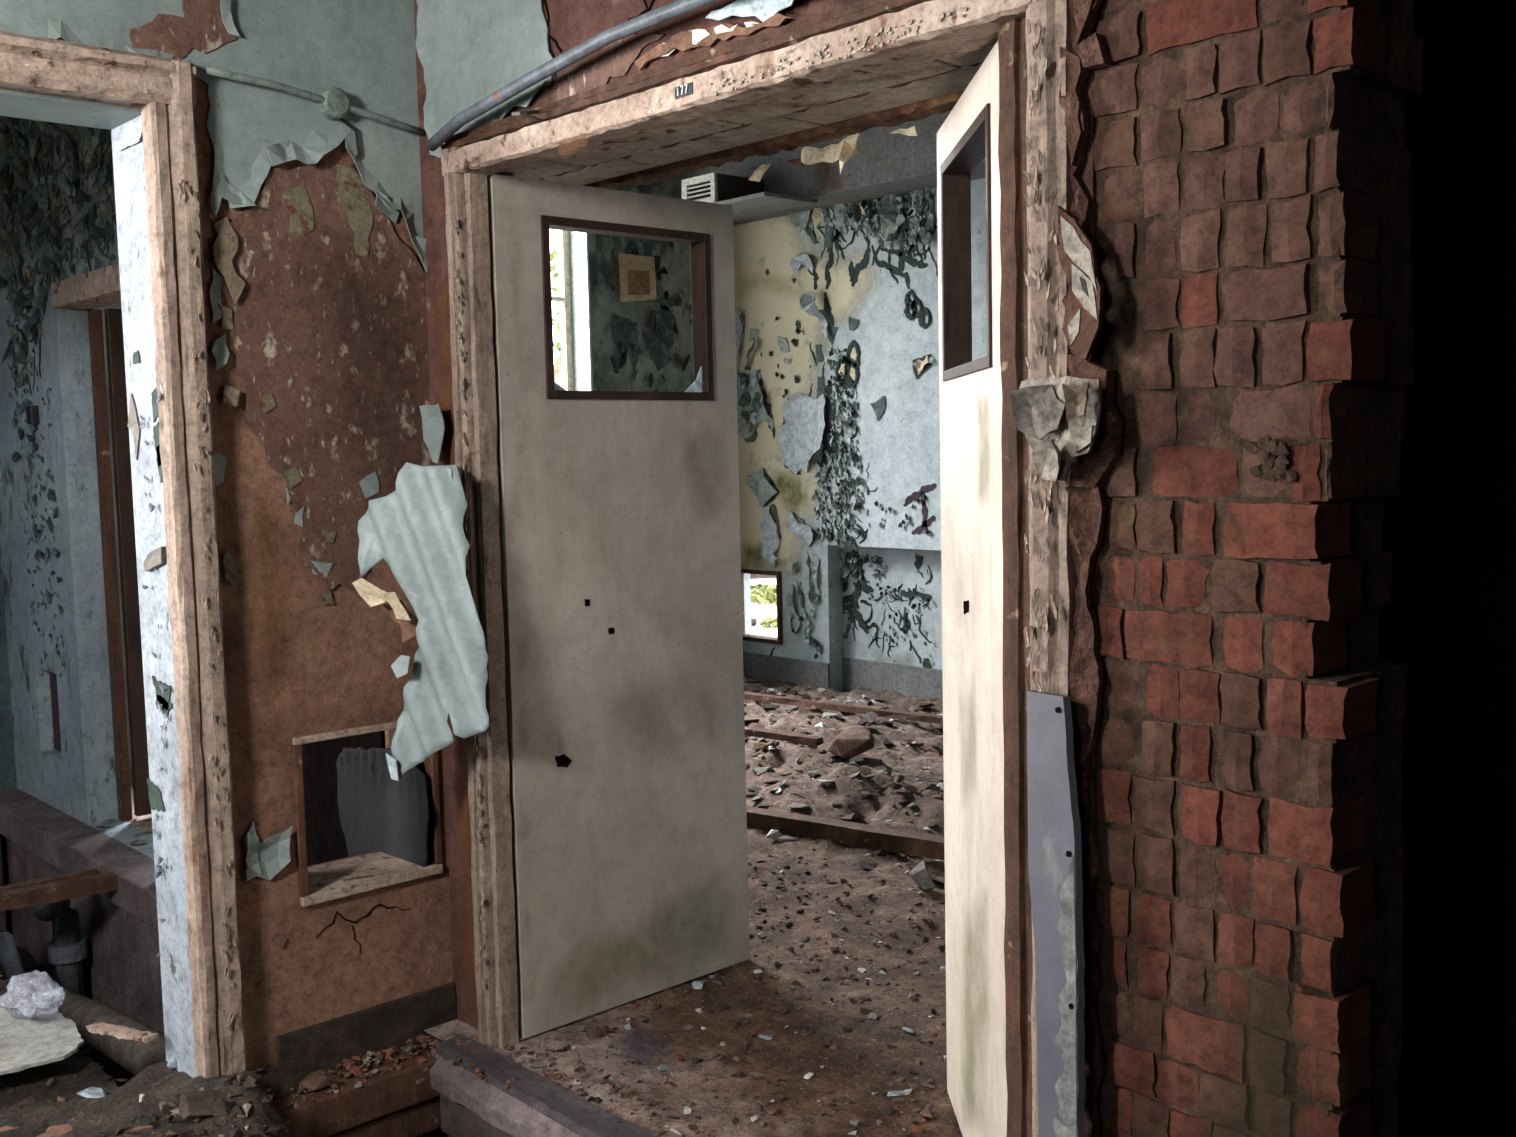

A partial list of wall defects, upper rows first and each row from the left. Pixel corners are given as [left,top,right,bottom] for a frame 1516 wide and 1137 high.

peeling [788,133,860,174]
peeling [890,126,918,136]
peeling [790,187,938,284]
flaking render [0,0,795,594]
peeling [0,116,142,680]
peeling [735,291,934,669]
flaking render [1011,0,1124,1137]
peeling [151,652,172,749]
peeling [147,767,168,879]
crack [316,903,410,953]